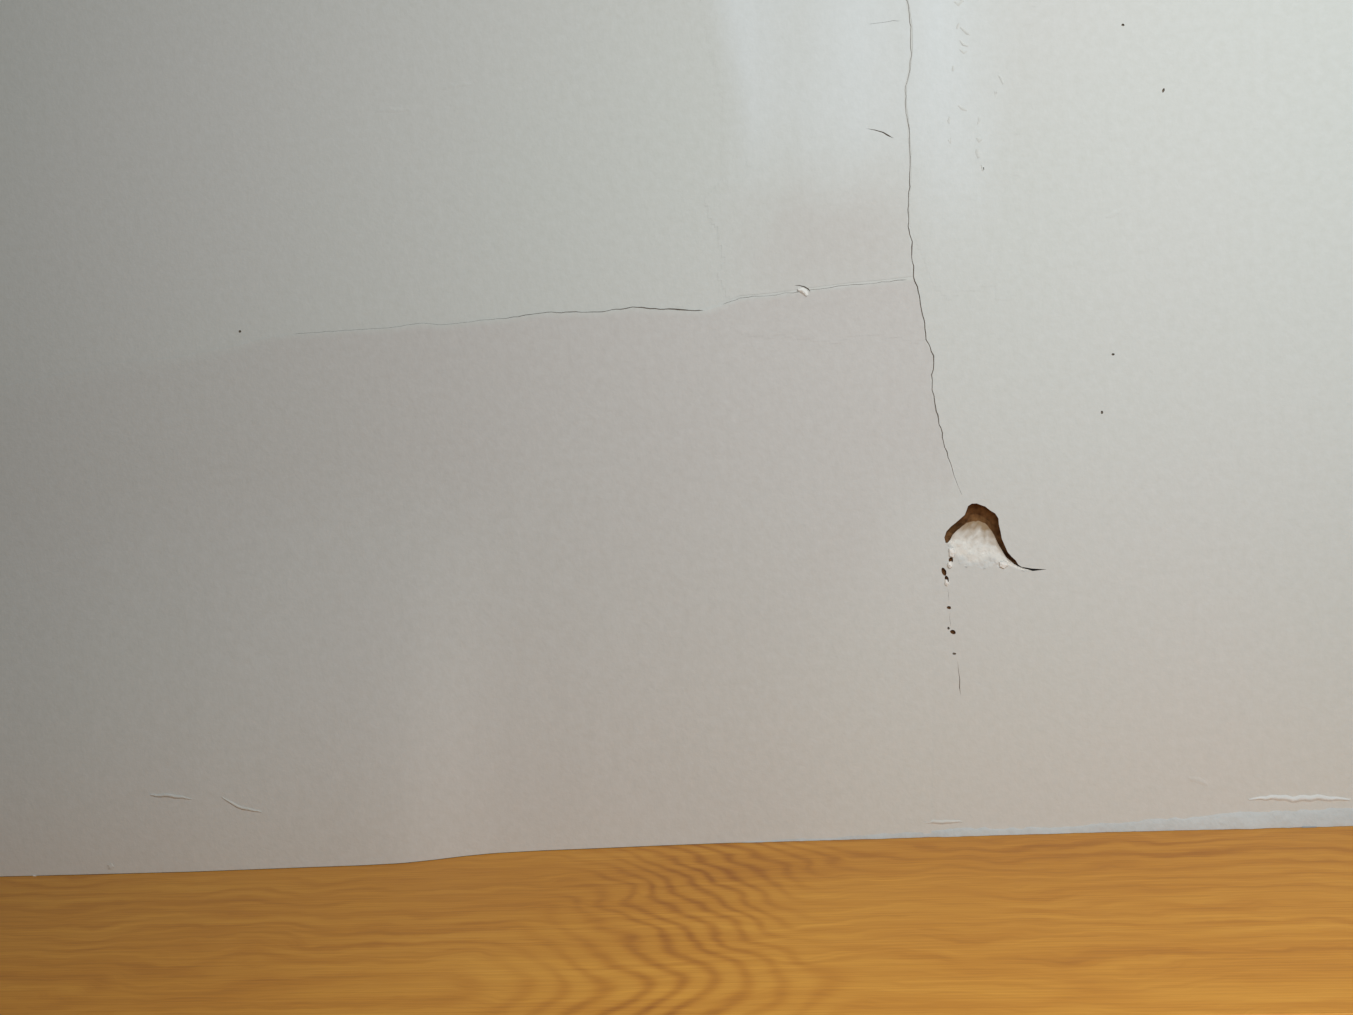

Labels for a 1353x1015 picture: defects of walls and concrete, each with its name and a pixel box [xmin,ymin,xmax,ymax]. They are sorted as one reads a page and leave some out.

crack [298,0,961,492]
flaking render [941,503,1046,586]
crack [947,593,961,694]